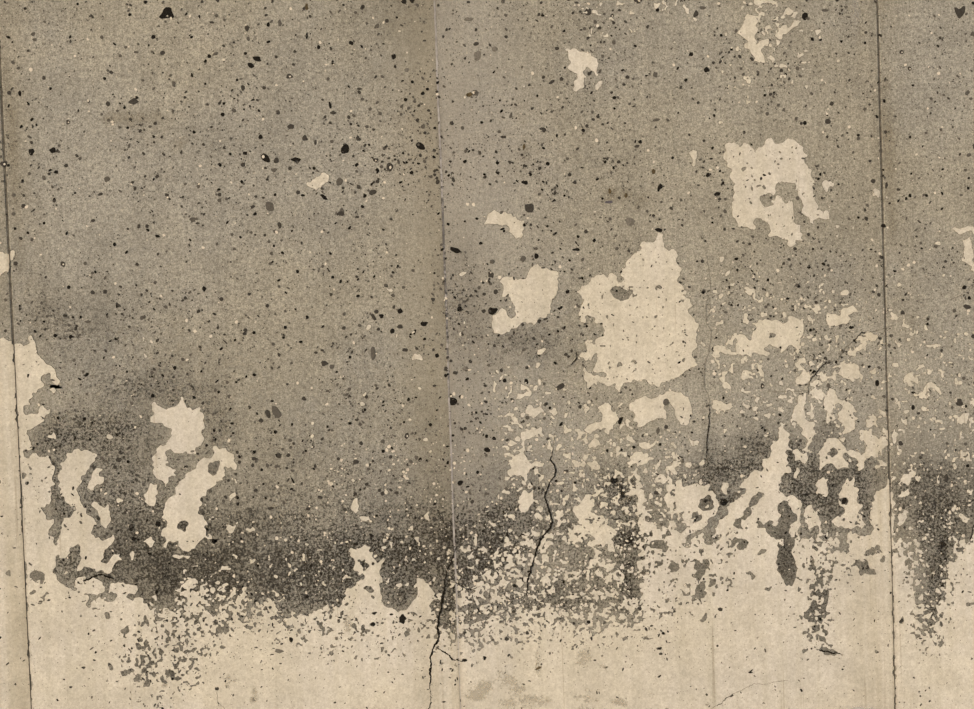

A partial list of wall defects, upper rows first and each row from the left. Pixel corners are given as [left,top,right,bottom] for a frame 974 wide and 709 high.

peeling [565,48,603,92]
peeling [572,2,614,38]
peeling [638,0,708,22]
peeling [716,0,821,105]
peeling [306,172,329,190]
peeling [483,210,525,239]
peeling [723,138,840,247]
peeling [0,226,974,709]
crack [516,415,559,611]
crack [428,543,483,709]